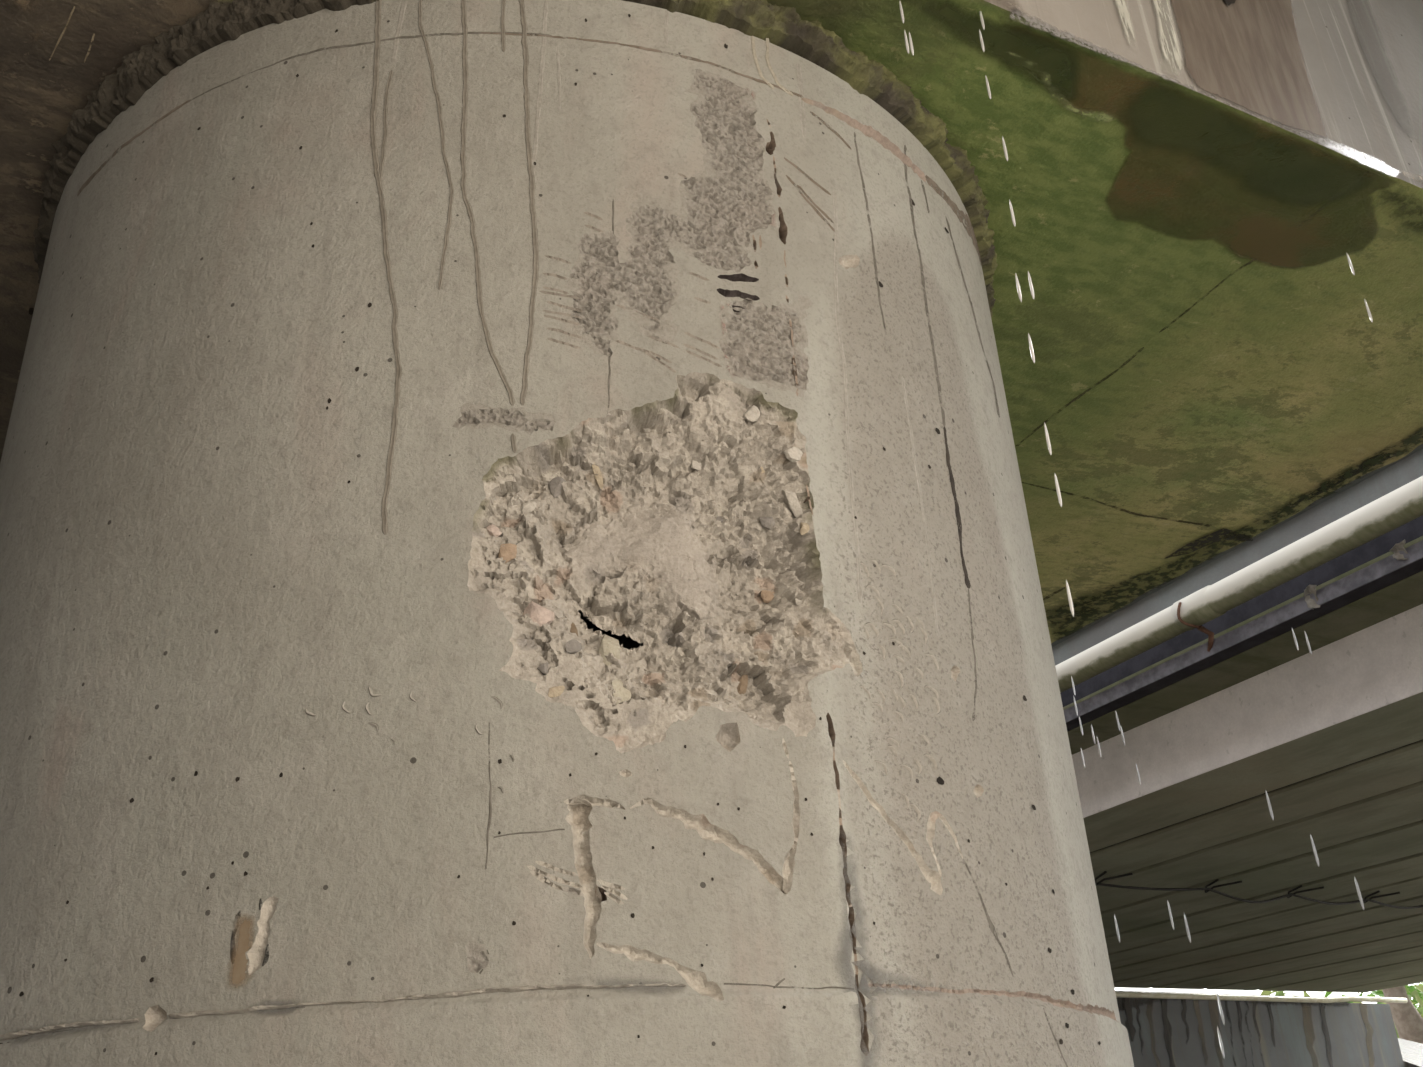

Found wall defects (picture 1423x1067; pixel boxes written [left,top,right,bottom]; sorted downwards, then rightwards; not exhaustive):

crack [77,32,981,396]
spalling [717,273,760,312]
crack [1016,260,1253,446]
damp [908,0,1399,268]
spalling [467,372,862,777]
crack [1022,482,1212,527]
peeling [247,896,279,975]
crack [724,713,1117,1067]
damp [1117,990,1204,1067]
damp [1225,1000,1349,1067]